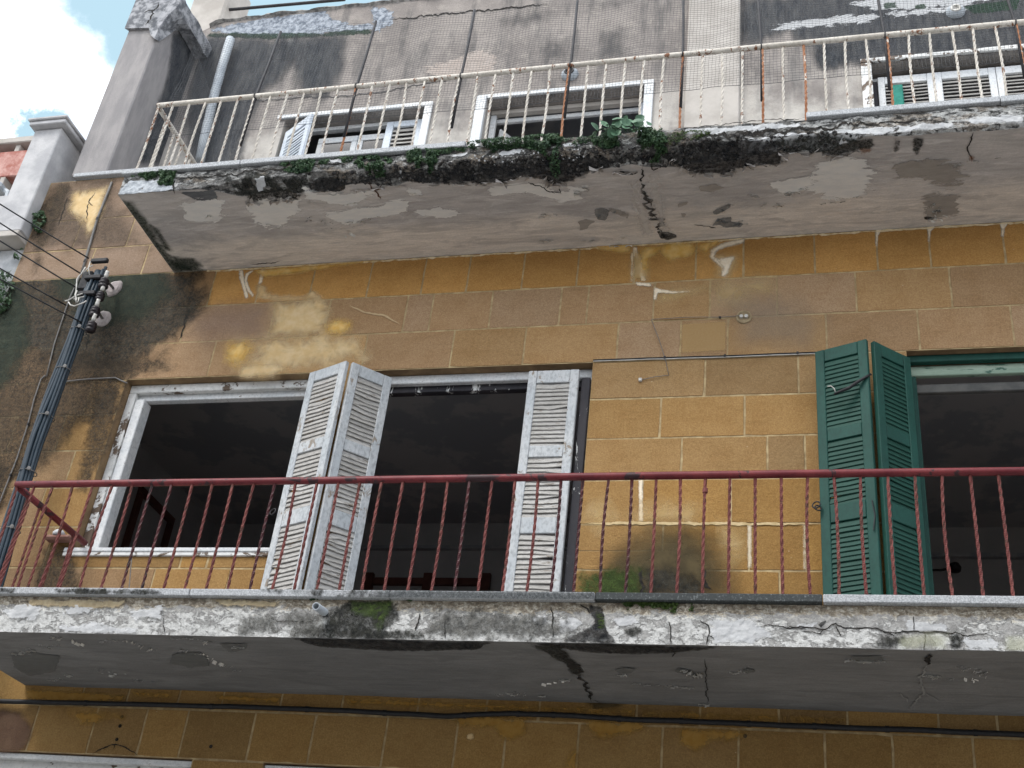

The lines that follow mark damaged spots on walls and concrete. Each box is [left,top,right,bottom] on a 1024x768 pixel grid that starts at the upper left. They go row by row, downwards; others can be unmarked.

peeling [969,115,1024,126]
spalling [177,122,953,230]
crack [620,166,665,232]
water stain [73,202,600,377]
water stain [631,221,1024,299]
water stain [0,278,81,384]
water stain [588,480,818,593]
peeling [2,604,41,621]
peeling [10,604,164,681]
water stain [295,605,490,651]
crack [550,607,600,703]
crack [756,616,989,665]